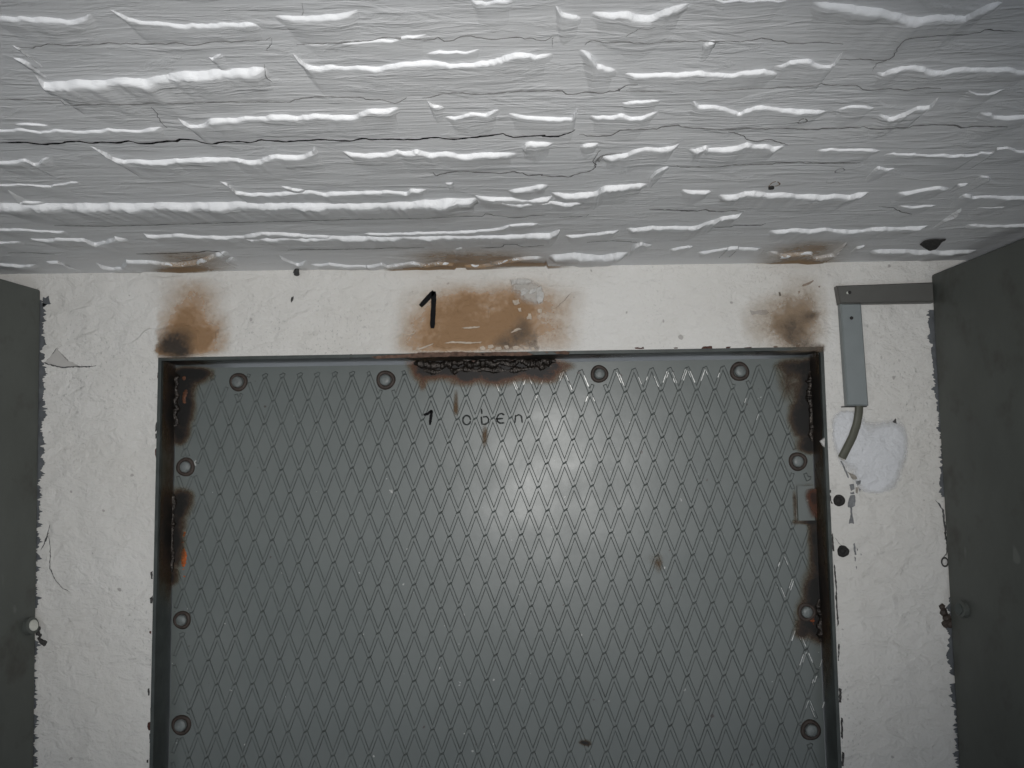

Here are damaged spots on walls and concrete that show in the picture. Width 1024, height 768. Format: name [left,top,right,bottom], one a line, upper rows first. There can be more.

crack [297,35,553,45]
crack [585,27,1017,91]
crack [0,37,1006,177]
crack [54,214,542,227]
crack [649,209,766,228]
crack [145,249,224,257]
peeling [920,239,946,251]
rust [155,291,219,358]
rust [372,288,570,359]
rust [766,280,824,351]
rust [806,489,817,517]